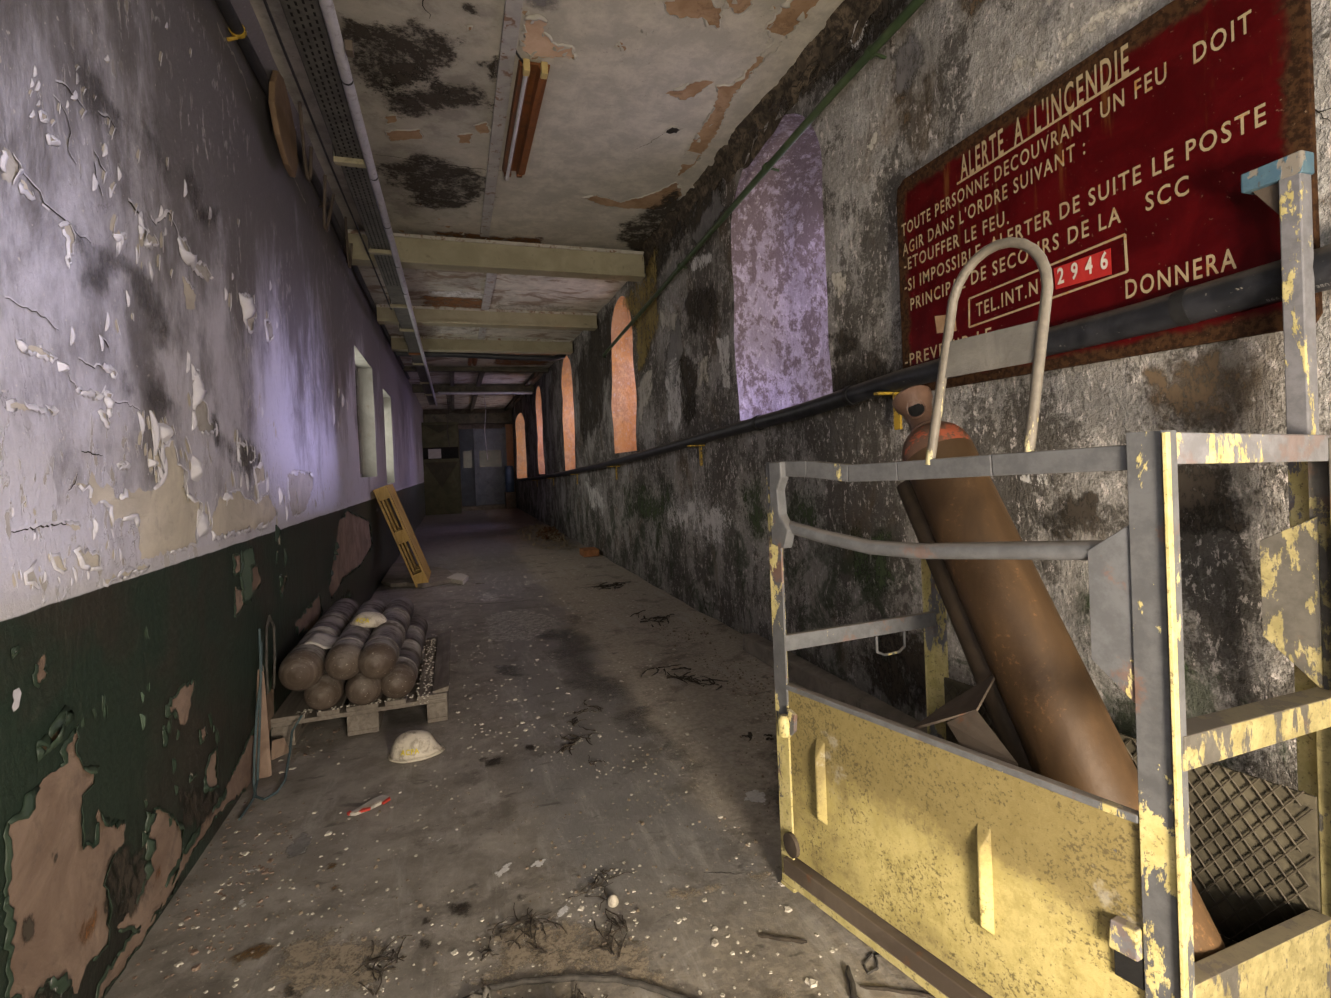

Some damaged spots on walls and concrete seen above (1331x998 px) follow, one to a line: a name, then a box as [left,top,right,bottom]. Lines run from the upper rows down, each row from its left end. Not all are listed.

crack [23,173,91,243]
crack [69,337,140,411]
crack [53,79,179,237]
peeling [110,203,278,343]
mould [341,18,499,118]
damp [575,171,730,442]
spalling [581,0,882,269]
crack [11,451,103,537]
peeling [6,351,317,618]
damp [1178,464,1260,535]
damp [864,631,927,713]
peeling [3,665,275,998]